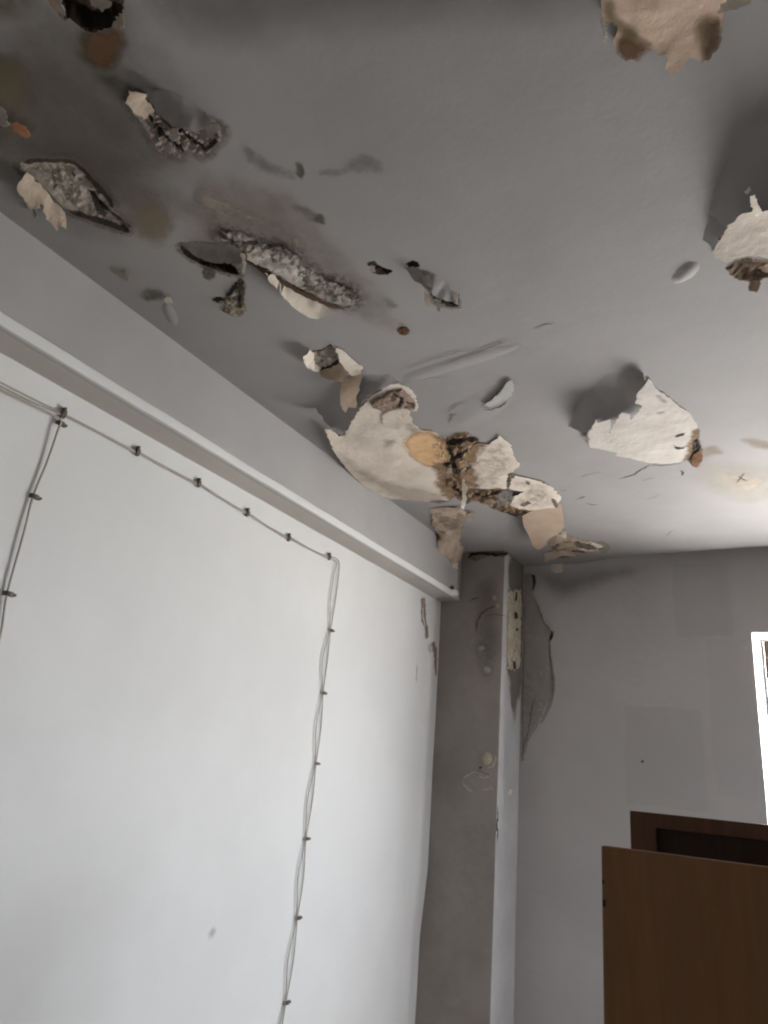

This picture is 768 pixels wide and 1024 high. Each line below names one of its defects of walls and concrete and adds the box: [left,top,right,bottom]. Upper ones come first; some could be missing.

spalling [48,0,125,33]
peeling [599,0,752,75]
spalling [125,88,227,160]
spalling [16,155,134,234]
peeling [702,89,768,293]
spalling [178,226,361,319]
peeling [367,260,460,312]
peeling [303,344,608,573]
peeling [568,369,704,468]
flaking render [506,573,554,761]